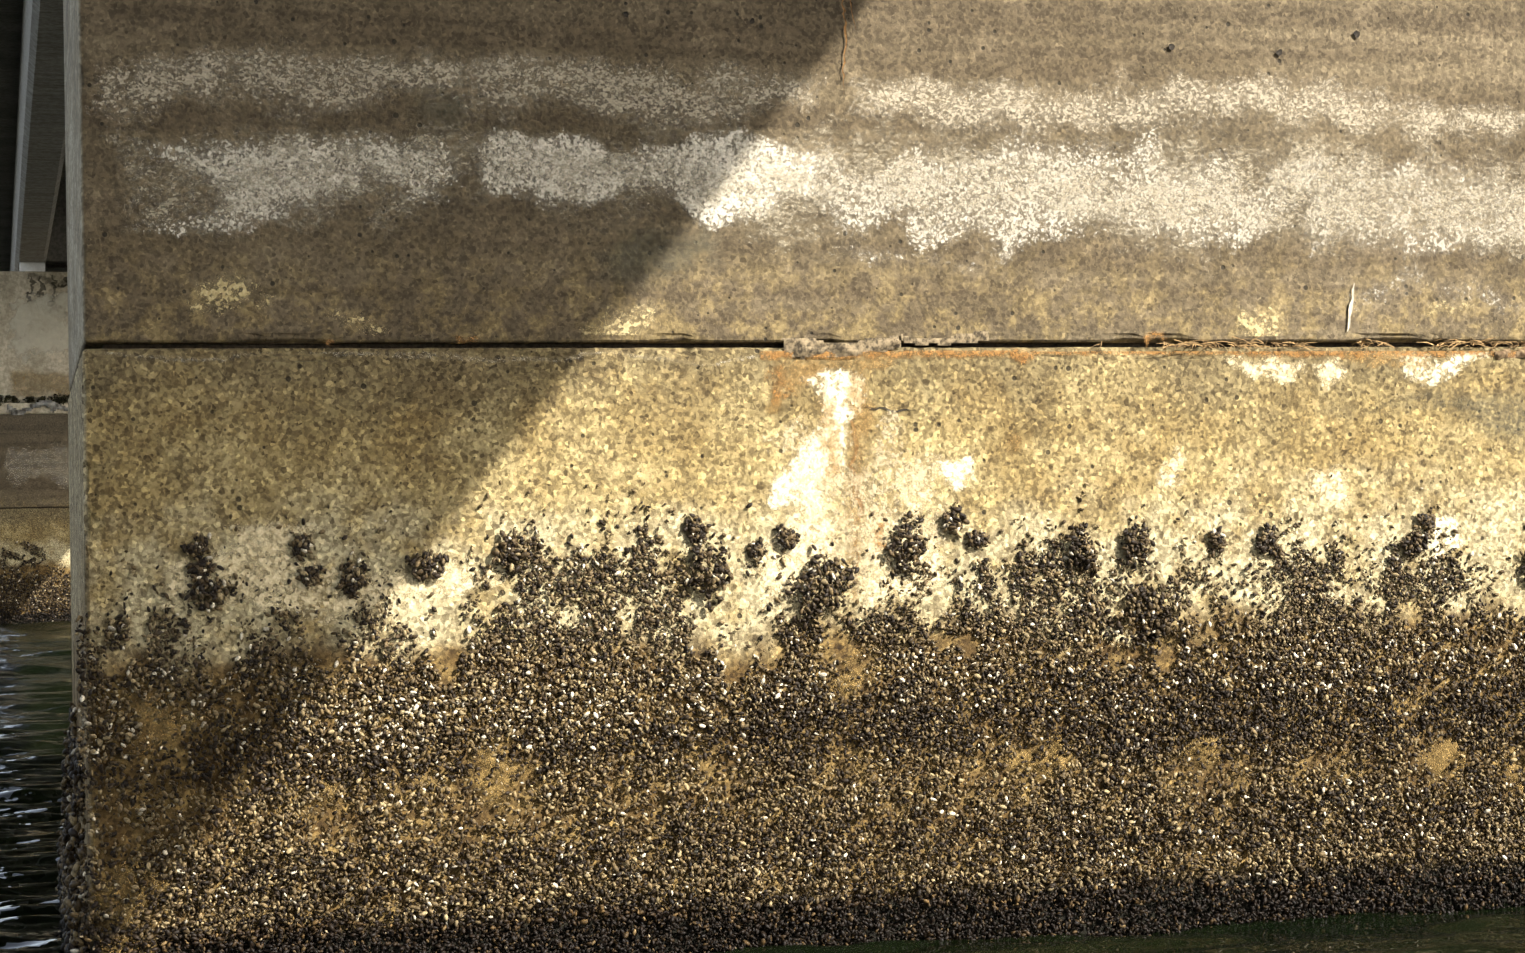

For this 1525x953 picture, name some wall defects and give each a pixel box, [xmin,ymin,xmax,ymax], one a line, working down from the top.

water stain [100,49,1524,250]
water stain [9,273,68,362]
water stain [749,369,974,609]
corrosion [761,332,1517,597]